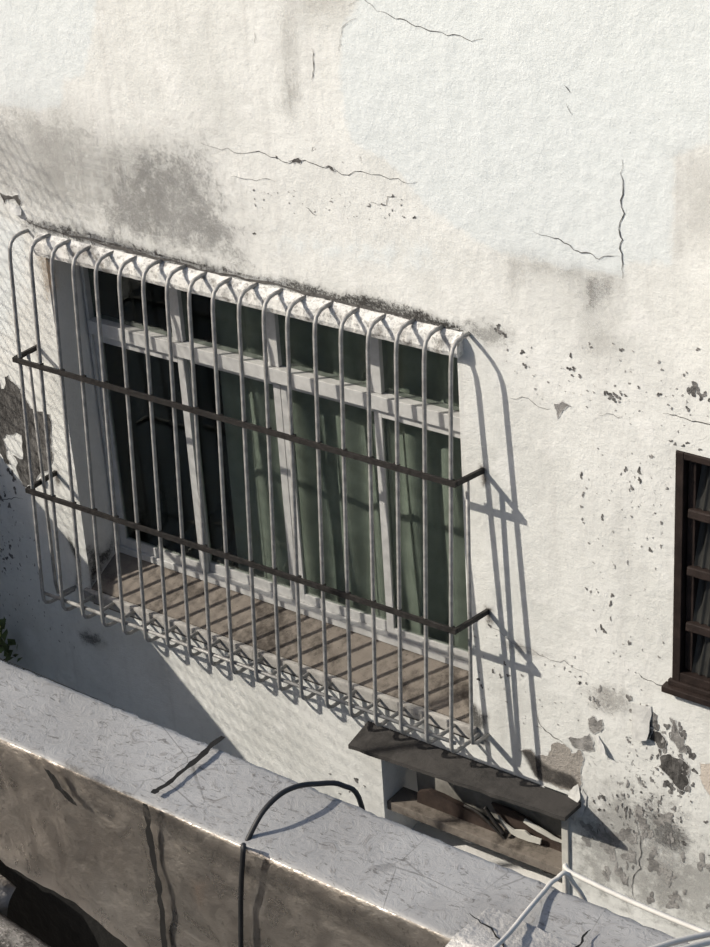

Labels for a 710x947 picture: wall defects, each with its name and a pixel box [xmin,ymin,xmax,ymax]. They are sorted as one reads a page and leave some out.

crack [338,0,483,51]
crack [201,143,405,206]
crack [543,162,625,279]
spalling [554,343,710,418]
peeling [0,375,54,523]
crack [0,658,123,710]
peeling [519,656,710,909]
crack [143,736,225,947]
crack [469,913,504,947]